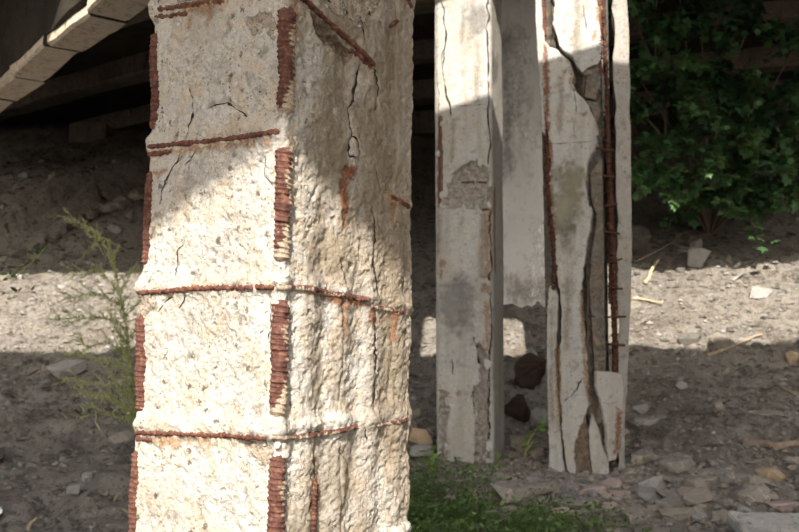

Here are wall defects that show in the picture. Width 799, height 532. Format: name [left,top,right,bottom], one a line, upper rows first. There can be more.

crack [188,88,247,129]
spalling [311,13,352,65]
crack [347,66,379,159]
crack [436,0,492,164]
rust [543,45,551,132]
rust [339,165,357,227]
spalling [436,116,492,212]
rust [323,296,363,335]
crack [371,209,406,410]
spalling [437,392,450,462]
spalling [471,337,493,464]
spalling [574,417,592,474]